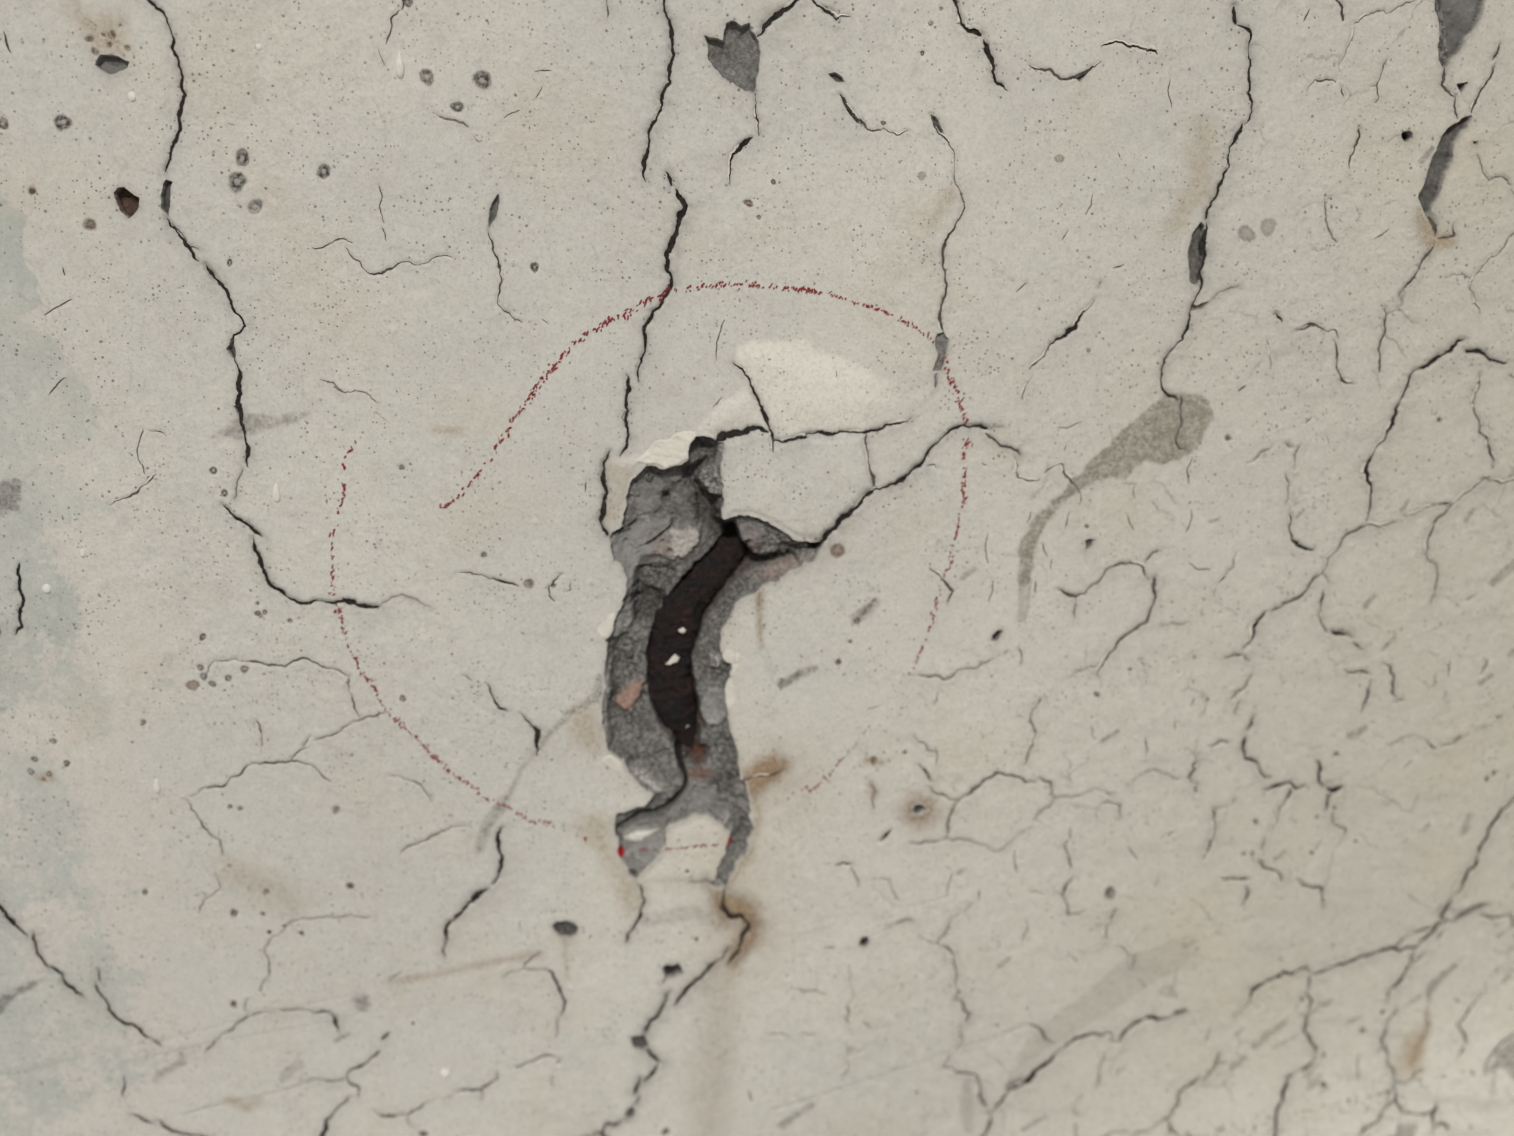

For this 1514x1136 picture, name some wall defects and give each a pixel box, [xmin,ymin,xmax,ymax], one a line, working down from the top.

crack [147,0,187,172]
crack [599,0,688,536]
spalling [704,20,761,93]
spalling [1188,222,1205,285]
crack [1160,7,1253,449]
spalling [1418,115,1478,218]
spalling [1435,0,1486,69]
crack [167,218,429,609]
crack [716,363,1081,543]
spalling [597,431,845,889]
crack [872,216,1514,969]
corrosion [716,893,760,953]